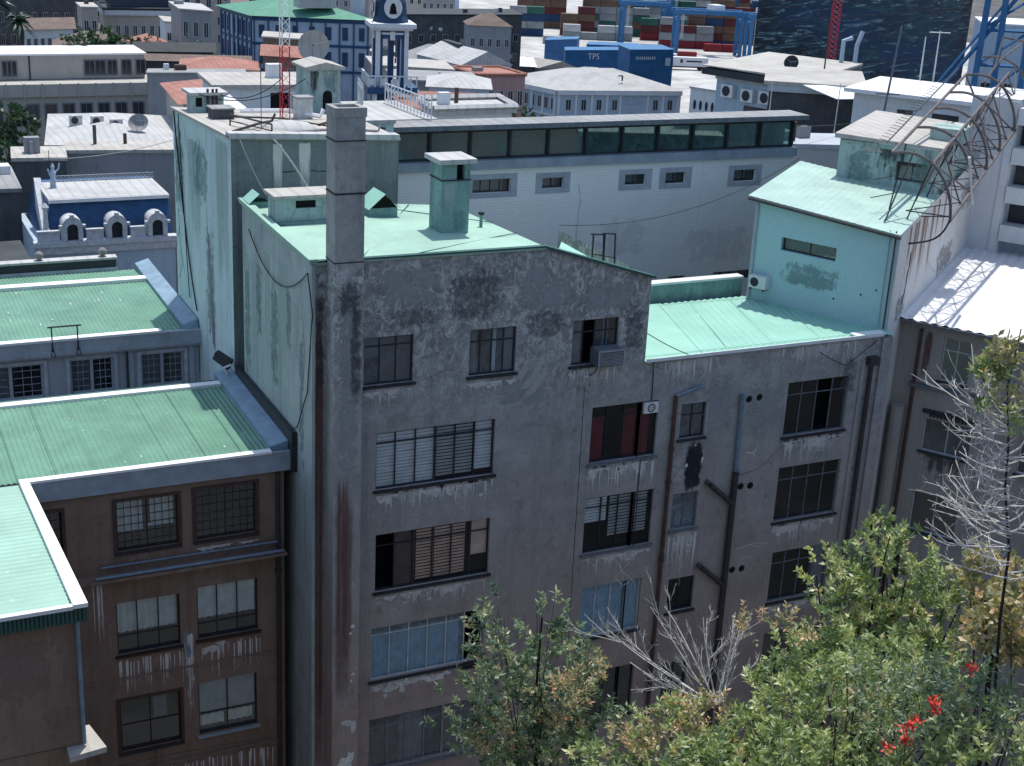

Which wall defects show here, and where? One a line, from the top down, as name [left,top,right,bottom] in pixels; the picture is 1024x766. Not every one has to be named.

leakage [206,213,215,349]
rust [337,491,351,685]
leakage [184,633,195,699]